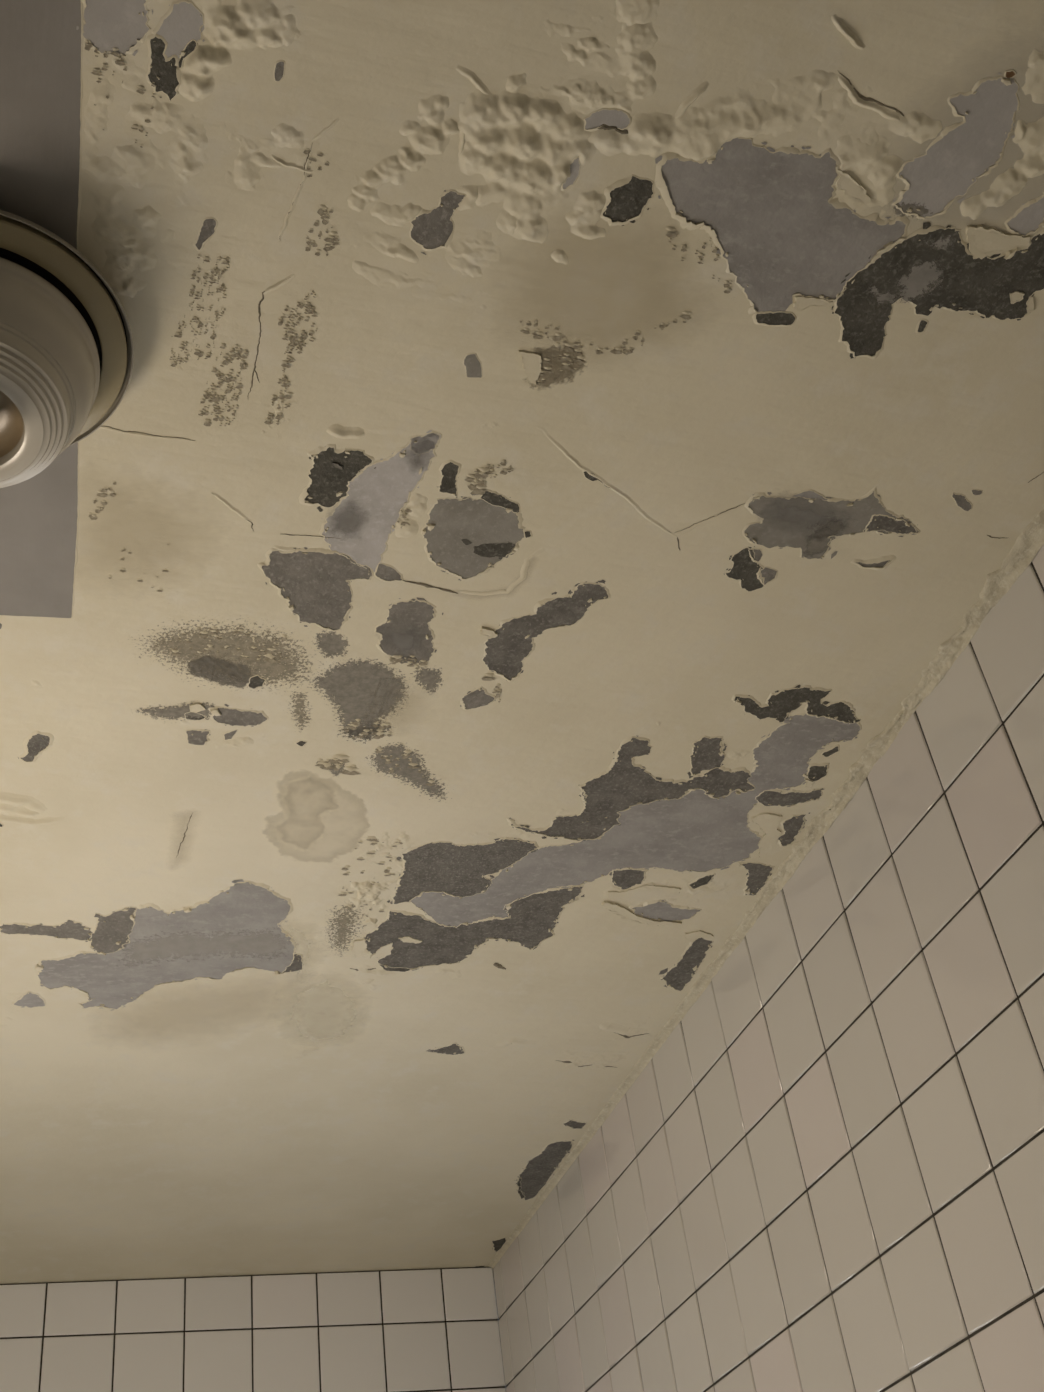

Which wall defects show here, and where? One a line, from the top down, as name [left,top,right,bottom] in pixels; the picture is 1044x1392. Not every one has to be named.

flaking render [0,0,210,298]
peeling [561,69,1044,359]
peeling [170,217,249,426]
peeling [463,353,483,378]
flaking render [0,442,79,630]
peeling [257,424,533,670]
peeling [724,487,920,592]
water stain [137,616,445,800]
spalling [460,580,611,710]
spalling [345,685,862,991]
peeling [0,879,303,1011]
peeling [515,1119,587,1200]